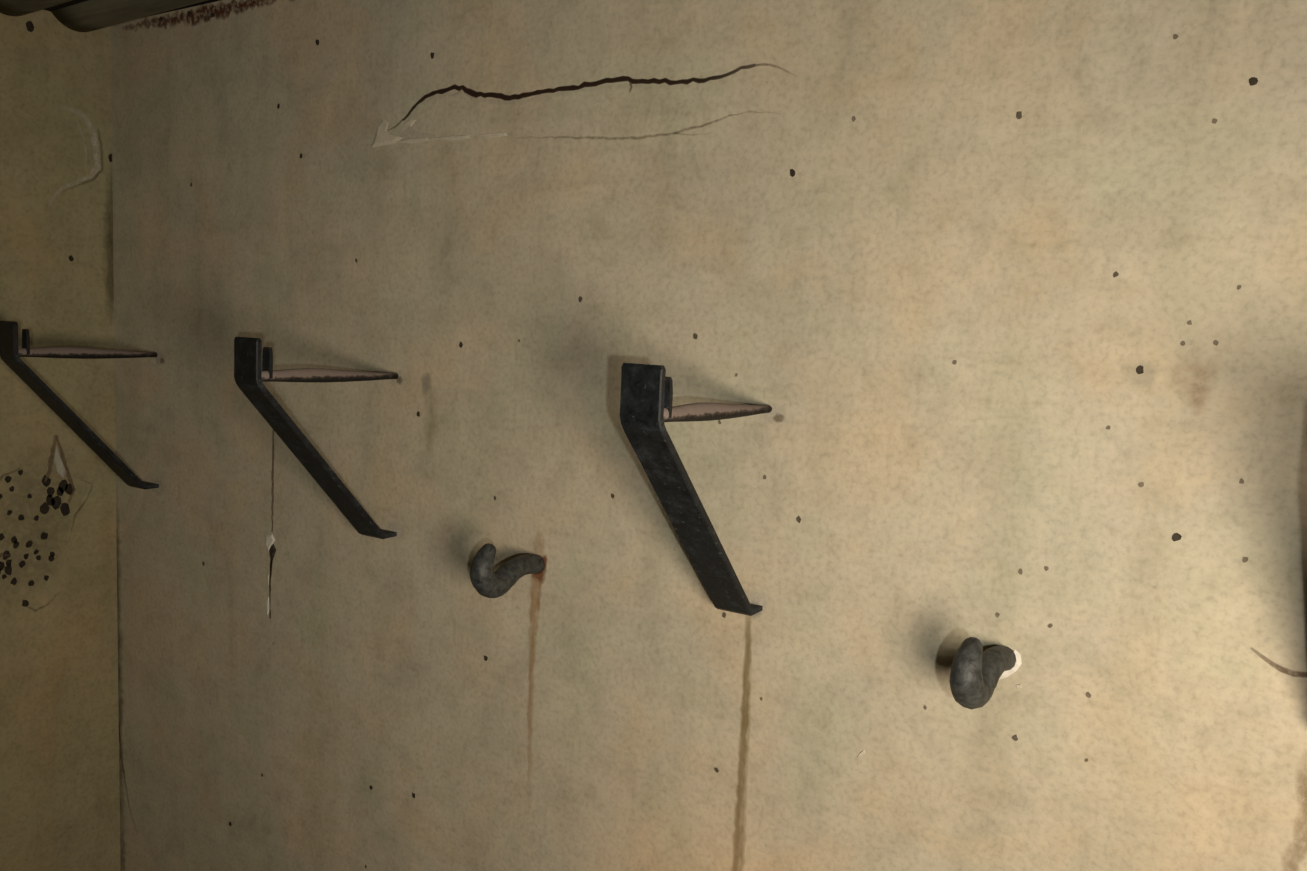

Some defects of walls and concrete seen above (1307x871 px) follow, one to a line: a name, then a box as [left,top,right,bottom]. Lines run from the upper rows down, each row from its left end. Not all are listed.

crack [397,64,769,125]